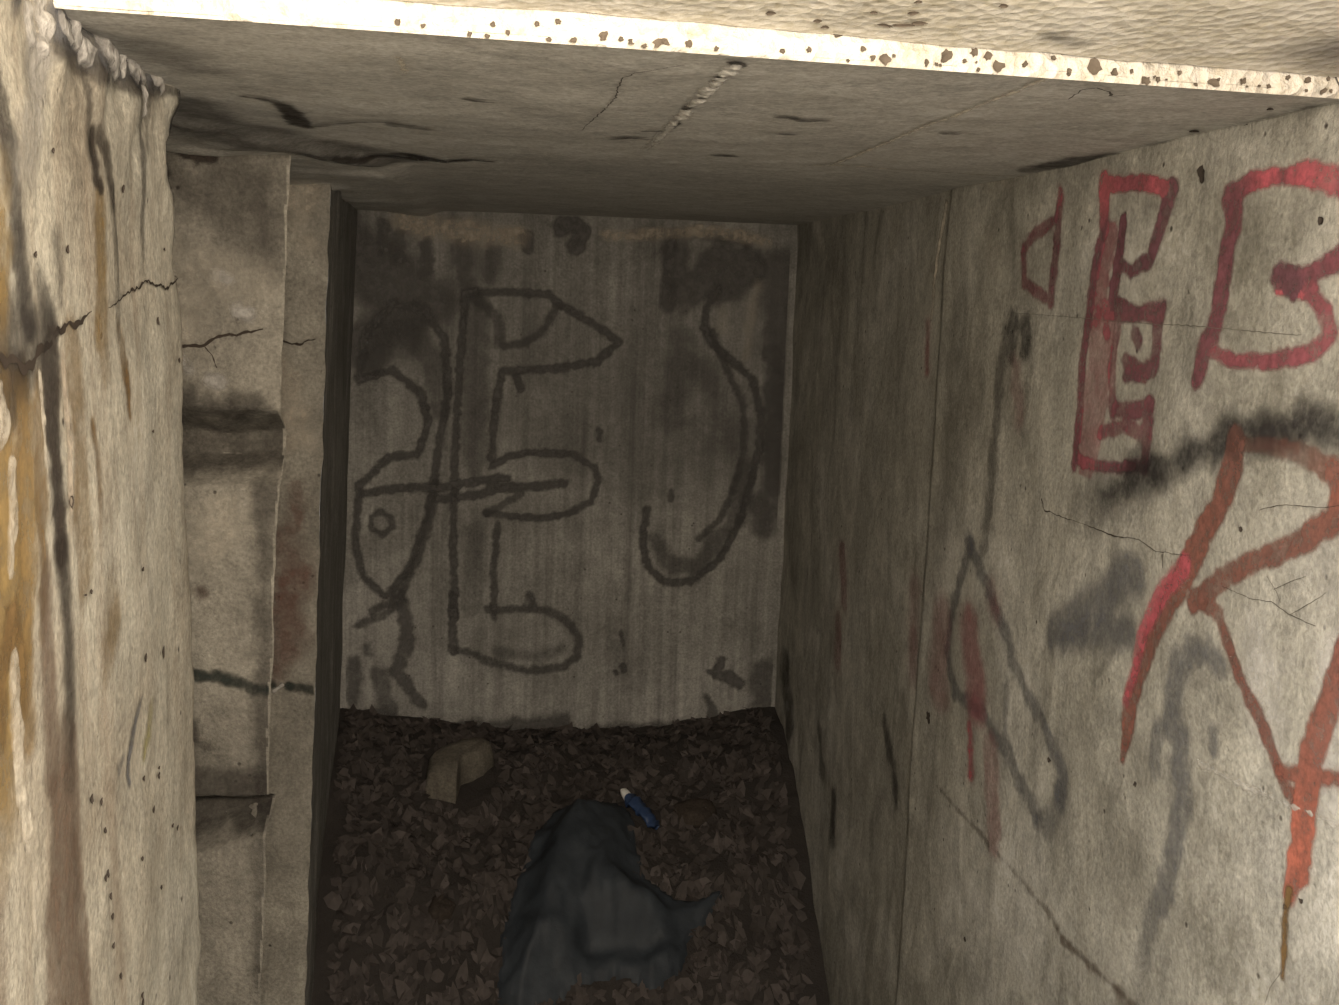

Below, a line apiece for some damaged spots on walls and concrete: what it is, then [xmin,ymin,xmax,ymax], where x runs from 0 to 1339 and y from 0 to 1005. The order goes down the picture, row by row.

crack [241,96,436,164]
rust [0,206,8,312]
leakage [0,78,49,458]
crack [182,328,315,368]
rust [0,344,48,815]
leakage [61,361,73,511]
crack [0,276,178,712]
leakage [14,675,33,848]
leakage [33,583,90,1005]